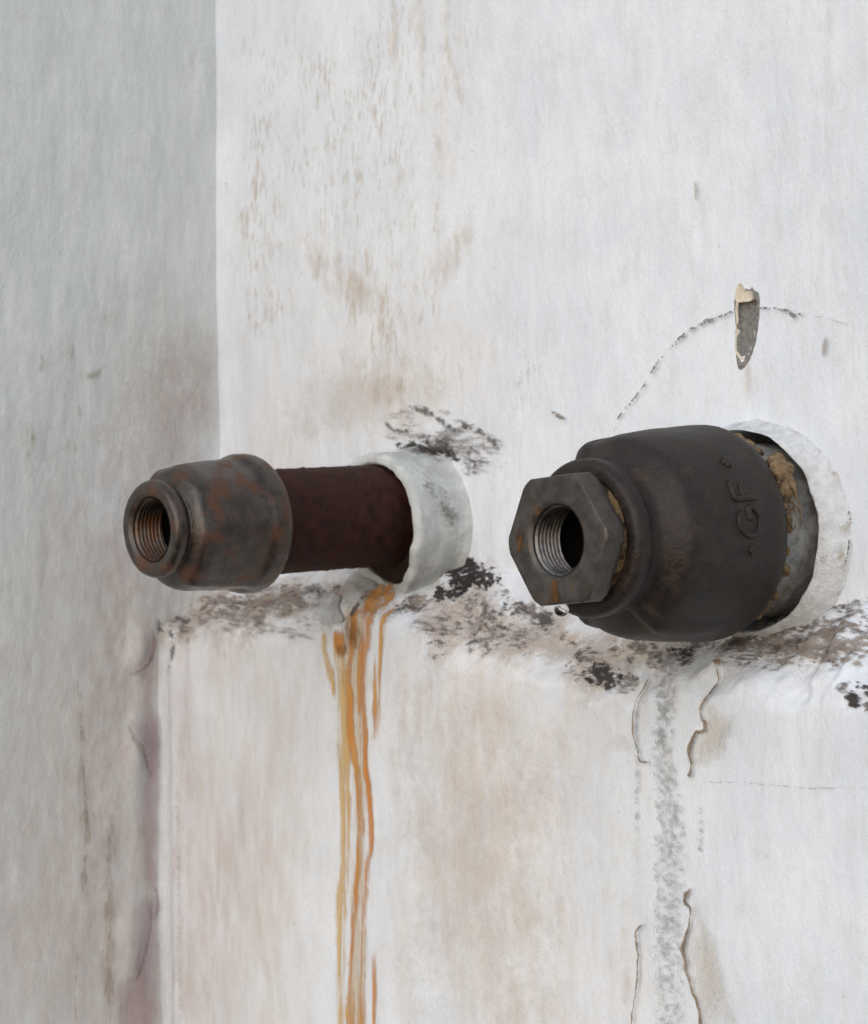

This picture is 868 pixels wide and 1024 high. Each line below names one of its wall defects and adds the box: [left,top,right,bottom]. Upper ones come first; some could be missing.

crack [614,311,732,430]
flaking render [734,283,760,370]
crack [757,307,846,325]
water stain [384,406,498,475]
water stain [398,557,559,654]
water stain [574,650,638,693]
peeling [685,664,728,778]
water stain [835,681,868,711]
rust [322,583,394,1024]
water stain [628,619,809,1024]
peeling [631,925,643,1024]
peeling [680,878,727,1024]